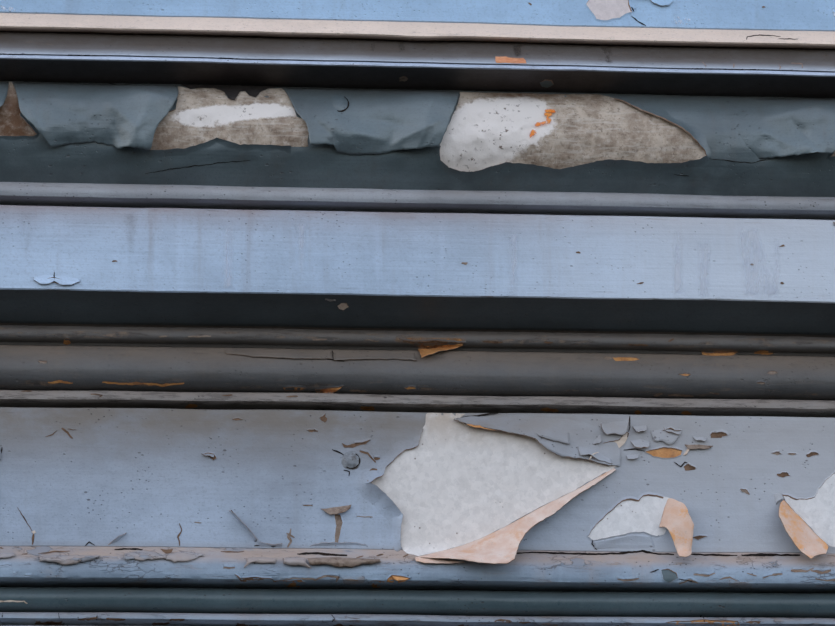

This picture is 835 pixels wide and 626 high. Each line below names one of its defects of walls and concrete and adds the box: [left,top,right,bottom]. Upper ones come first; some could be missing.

peeling [584,0,646,26]
peeling [0,74,712,183]
peeling [735,99,835,162]
peeling [353,413,729,564]
peeling [774,471,835,559]
peeling [368,573,412,590]
peeling [652,567,692,585]